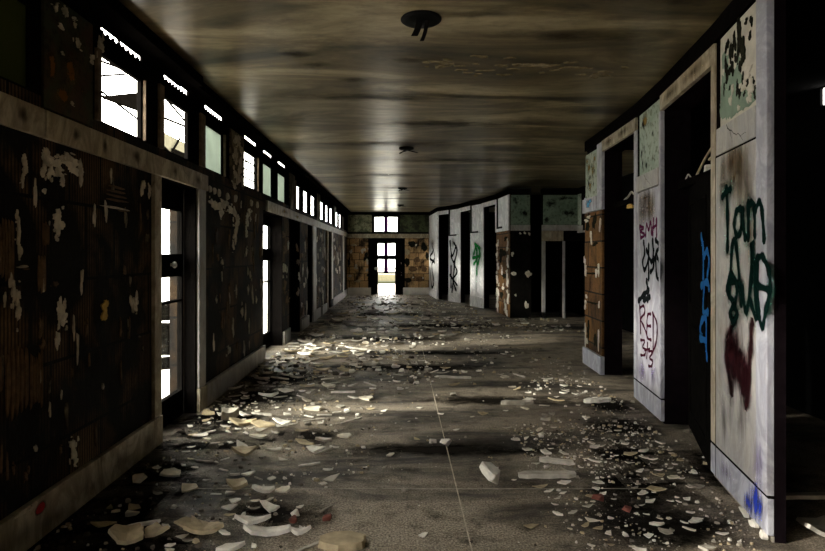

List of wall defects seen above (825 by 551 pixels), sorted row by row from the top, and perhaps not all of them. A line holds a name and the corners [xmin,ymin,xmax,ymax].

flaking render [720,16,756,120]
flaking render [20,147,84,208]
flaking render [49,206,65,242]
flaking render [92,200,130,228]
flaking render [3,209,29,332]
flaking render [55,296,91,377]
flaking render [100,300,109,321]
flaking render [123,266,139,339]
flaking render [208,196,263,357]
flaking render [496,238,532,316]
flaking render [48,376,80,467]